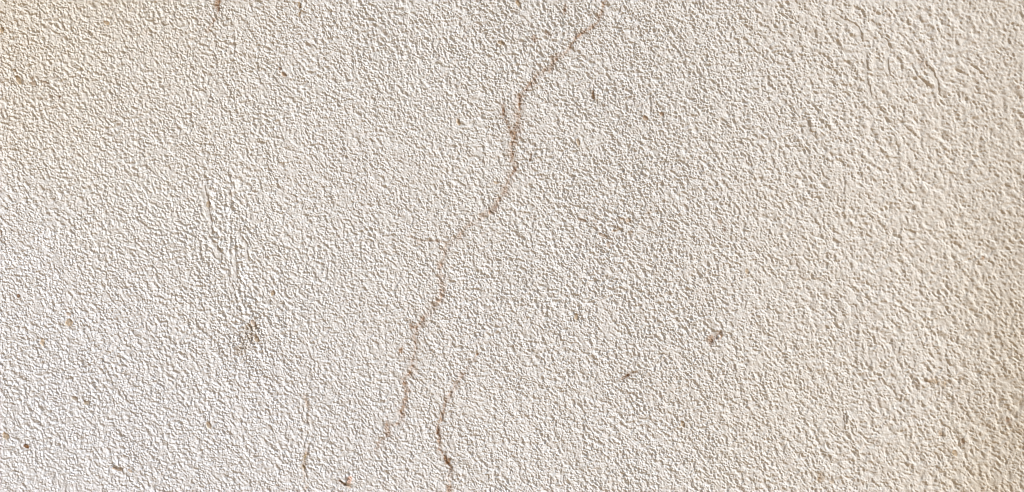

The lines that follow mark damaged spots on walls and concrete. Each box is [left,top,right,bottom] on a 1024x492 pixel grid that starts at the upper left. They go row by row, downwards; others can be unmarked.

crack [432,351,480,492]
crack [371,0,609,454]